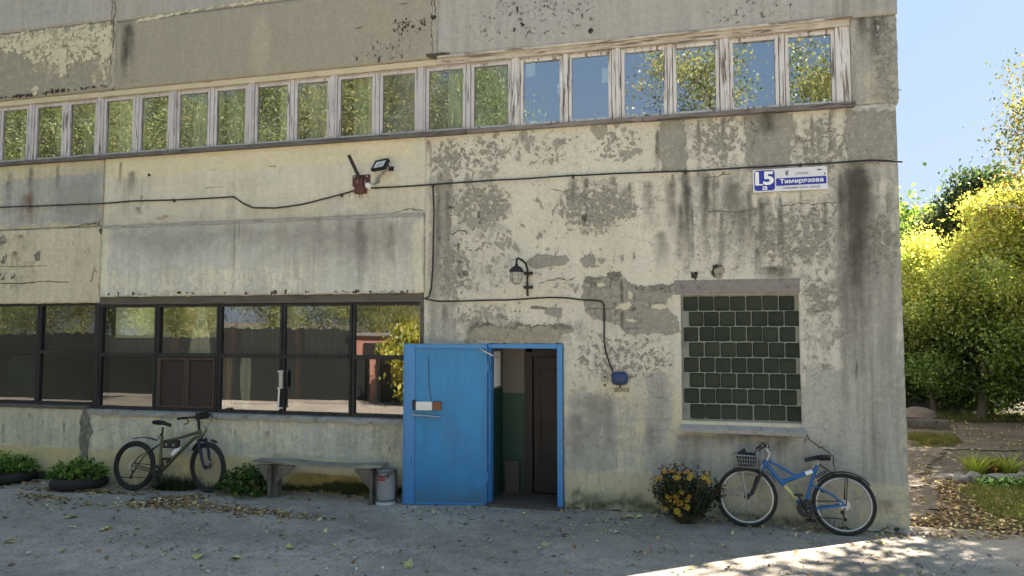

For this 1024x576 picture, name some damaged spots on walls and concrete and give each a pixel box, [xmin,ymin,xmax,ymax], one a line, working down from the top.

peeling [0,0,119,99]
peeling [427,15,902,397]
damp [679,185,690,225]
damp [703,179,715,208]
damp [848,169,868,252]
crack [804,434,835,468]